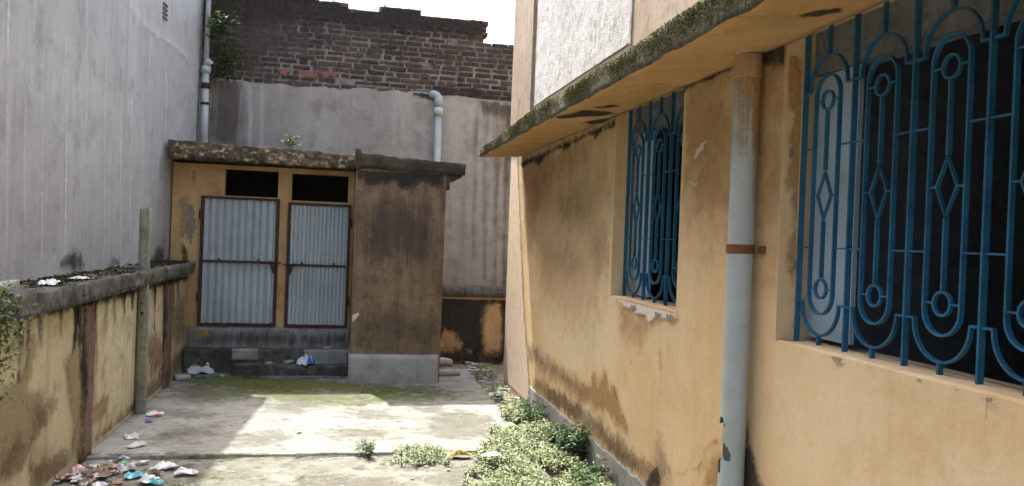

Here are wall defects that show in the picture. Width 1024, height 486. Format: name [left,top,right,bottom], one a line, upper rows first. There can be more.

damp [683,68,731,101]
damp [521,120,615,168]
damp [440,299,506,365]
spalling [617,299,676,322]
damp [19,275,188,451]
damp [529,345,625,429]
damp [30,451,67,486]
damp [646,454,666,486]